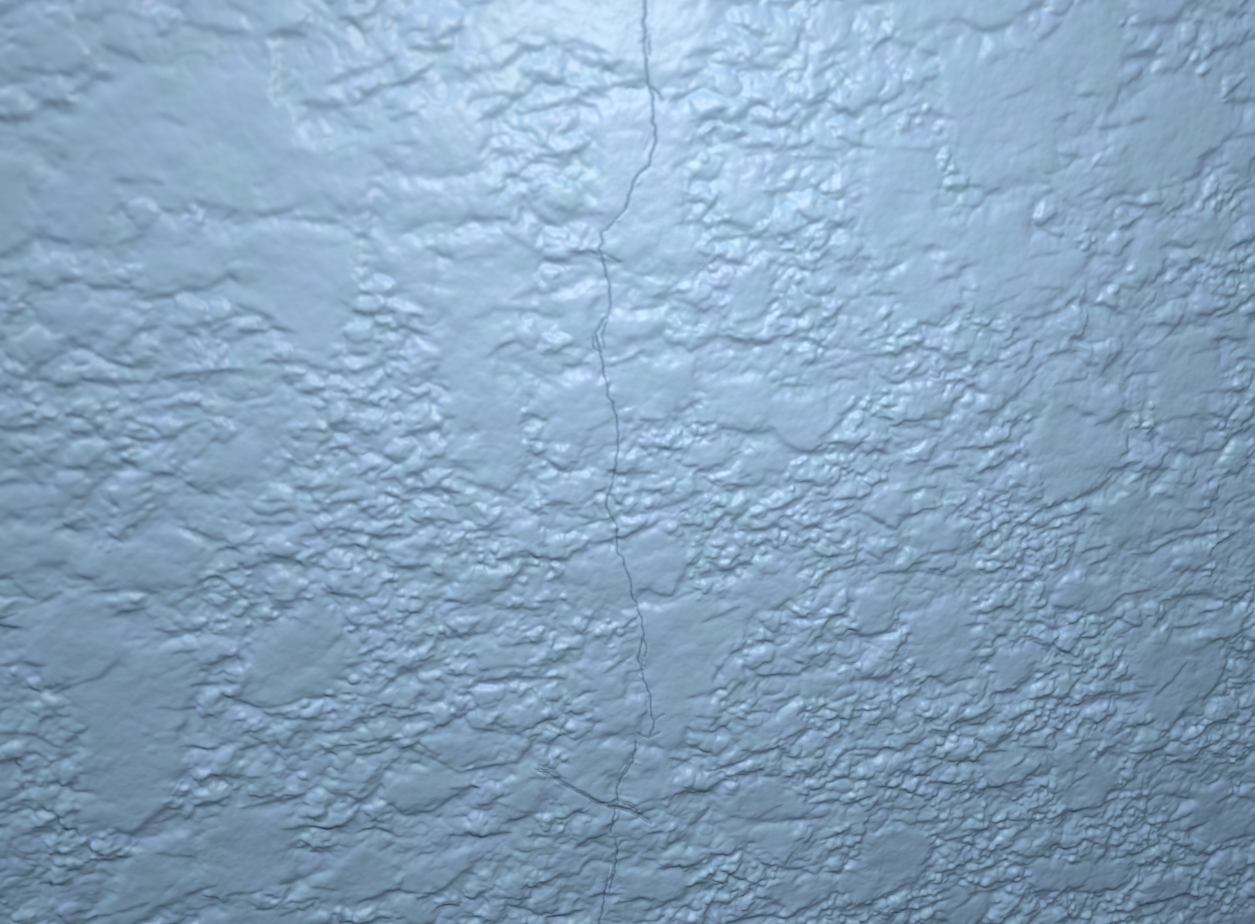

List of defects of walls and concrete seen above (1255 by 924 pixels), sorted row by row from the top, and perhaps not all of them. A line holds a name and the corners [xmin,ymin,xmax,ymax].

crack [540,0,662,924]